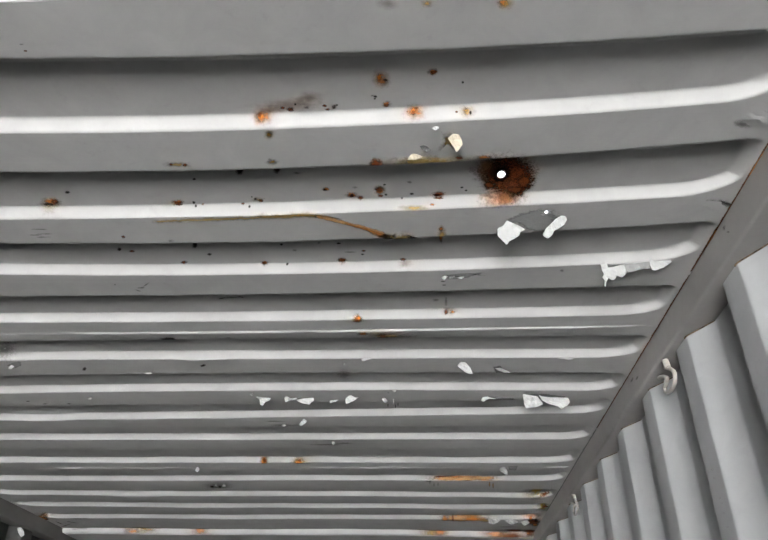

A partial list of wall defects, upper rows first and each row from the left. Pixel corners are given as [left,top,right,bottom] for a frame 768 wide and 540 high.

peeling [444,134,463,152]
peeling [408,145,430,160]
rust [156,196,418,239]
peeling [497,210,567,244]
peeling [600,257,671,287]
rust [486,143,768,537]
peeling [285,396,314,404]
peeling [523,394,570,409]
rust [427,475,494,487]